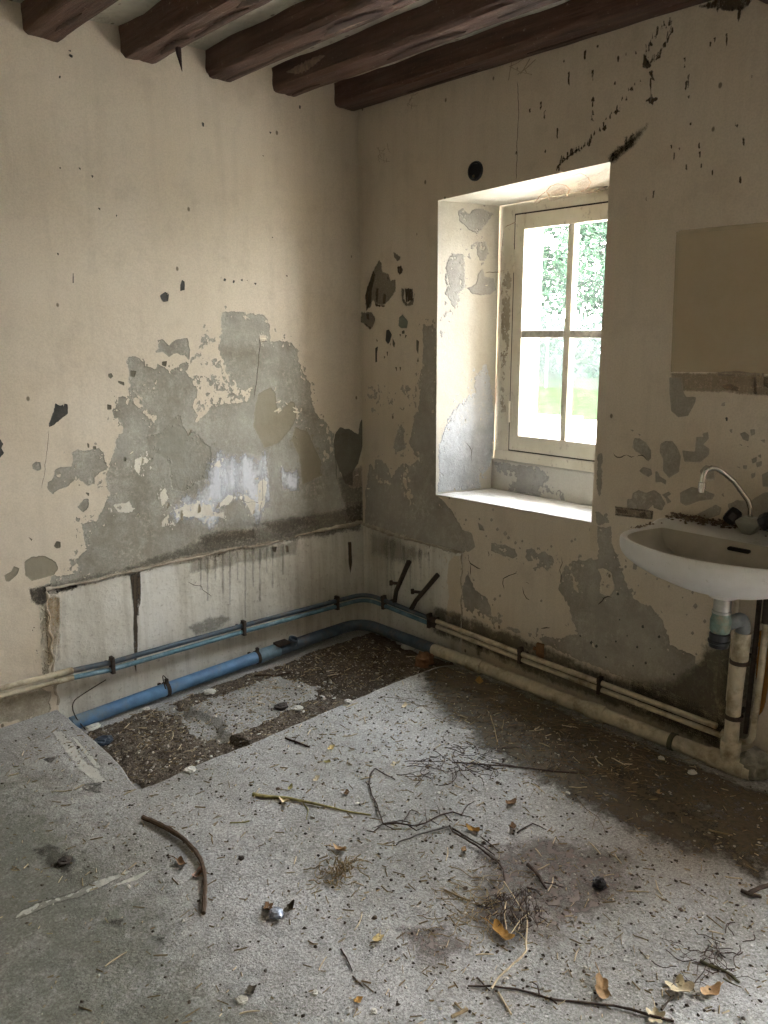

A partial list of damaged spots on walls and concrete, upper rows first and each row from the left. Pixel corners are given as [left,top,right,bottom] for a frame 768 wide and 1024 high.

water stain [535,17,673,204]
peeling [0,205,717,724]
peeling [627,402,768,518]
water stain [29,454,362,670]
water stain [434,608,731,748]
water stain [739,631,754,739]